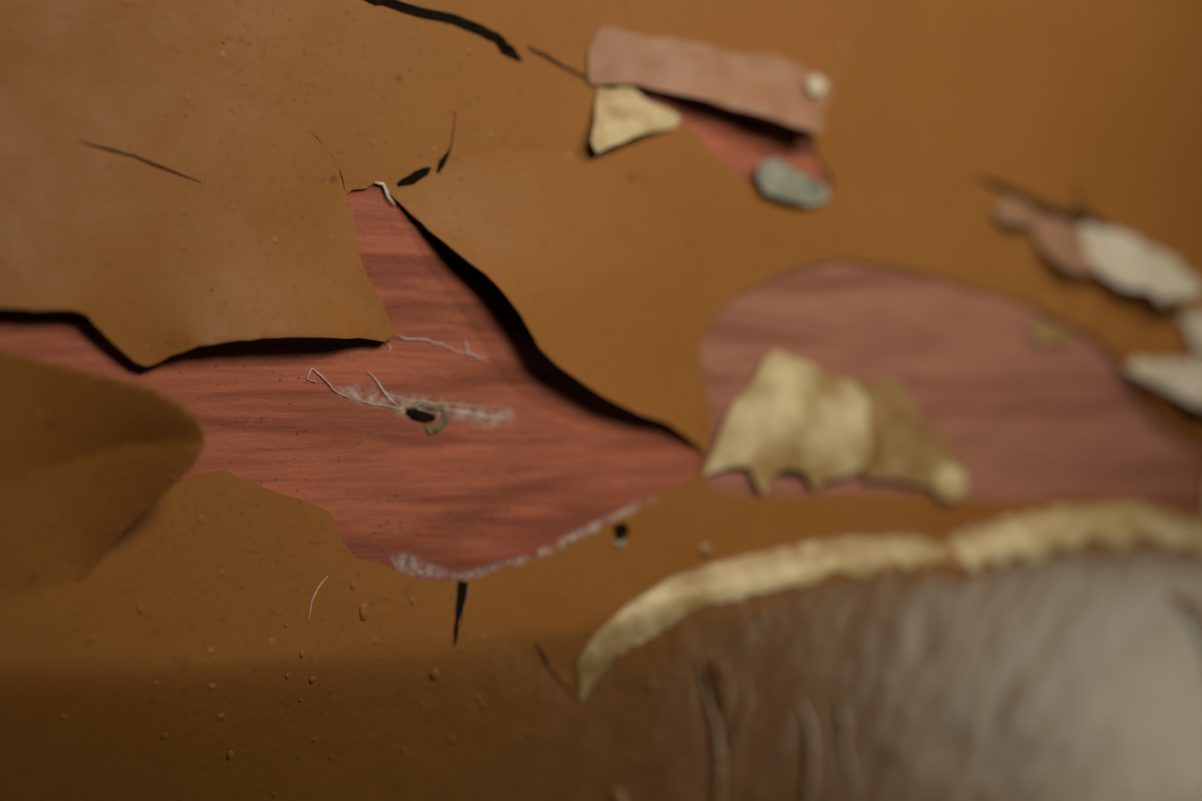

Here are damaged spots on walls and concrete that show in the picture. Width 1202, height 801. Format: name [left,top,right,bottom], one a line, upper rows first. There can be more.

crack [363,0,588,81]
peeling [0,27,1202,646]